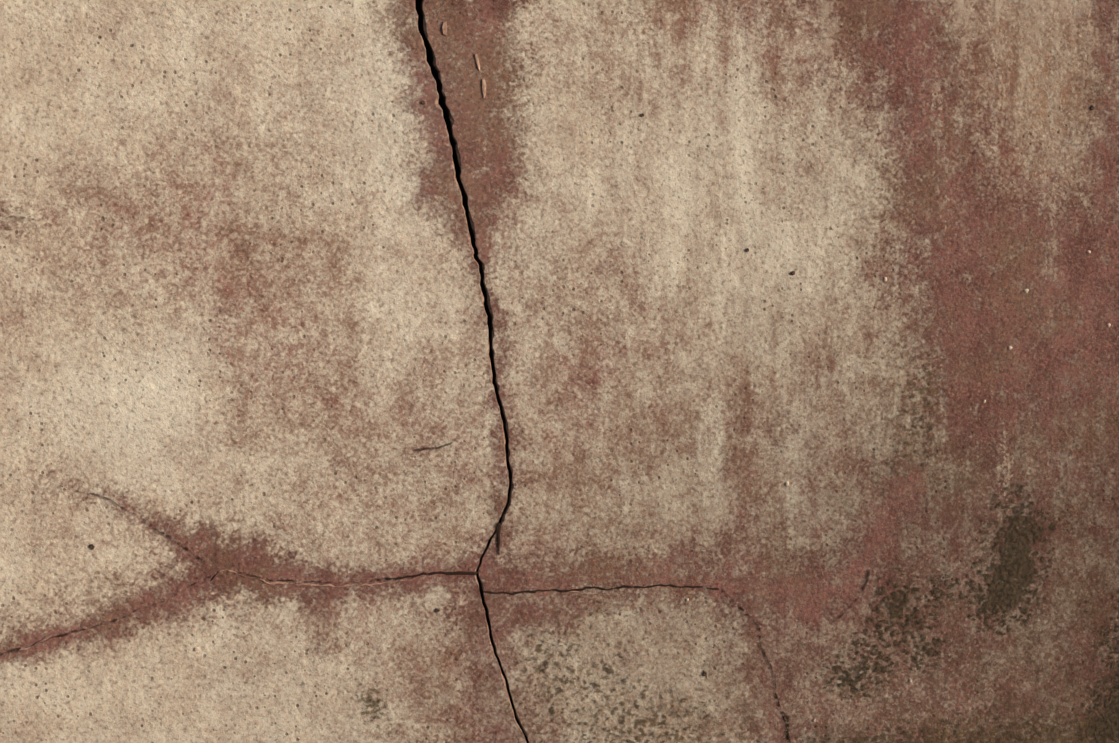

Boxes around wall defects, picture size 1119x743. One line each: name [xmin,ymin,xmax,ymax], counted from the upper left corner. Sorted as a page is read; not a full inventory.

damp [386,0,528,282]
damp [842,0,1119,477]
crack [76,0,791,743]
damp [487,339,523,489]
crack [0,610,137,656]
damp [359,683,387,721]
damp [0,445,1056,698]
mould [525,634,717,743]